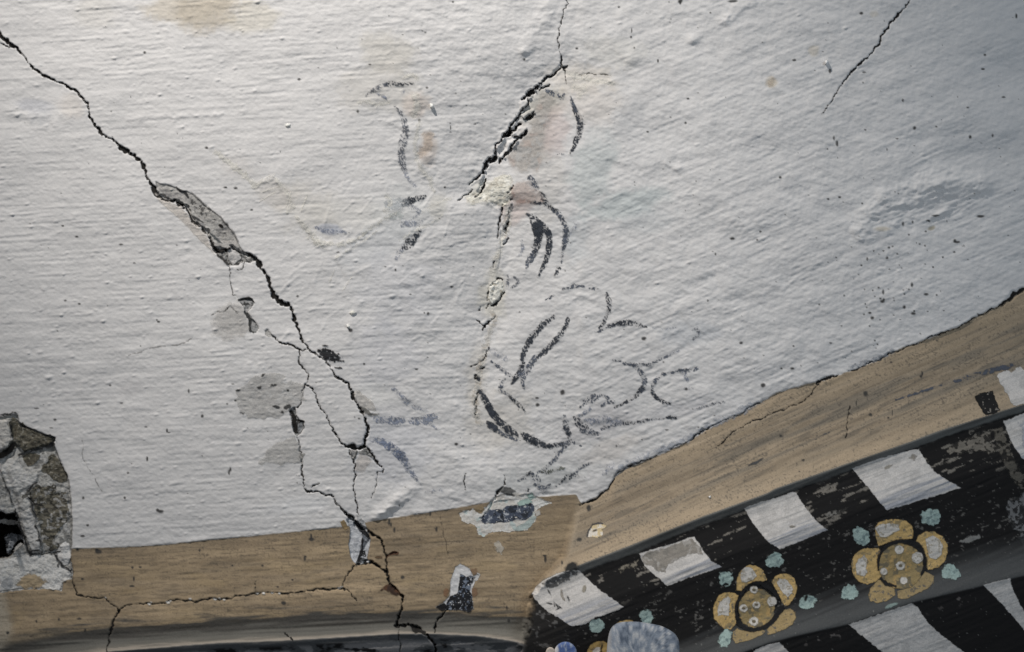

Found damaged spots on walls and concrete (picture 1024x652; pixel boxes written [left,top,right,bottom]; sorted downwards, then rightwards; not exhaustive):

crack [823,1,909,113]
flaking render [156,182,255,265]
crack [459,0,607,416]
crack [0,32,446,652]
flaking render [0,412,73,593]
flaking render [341,515,370,565]
peeling [436,564,480,612]
peeling [459,486,551,555]